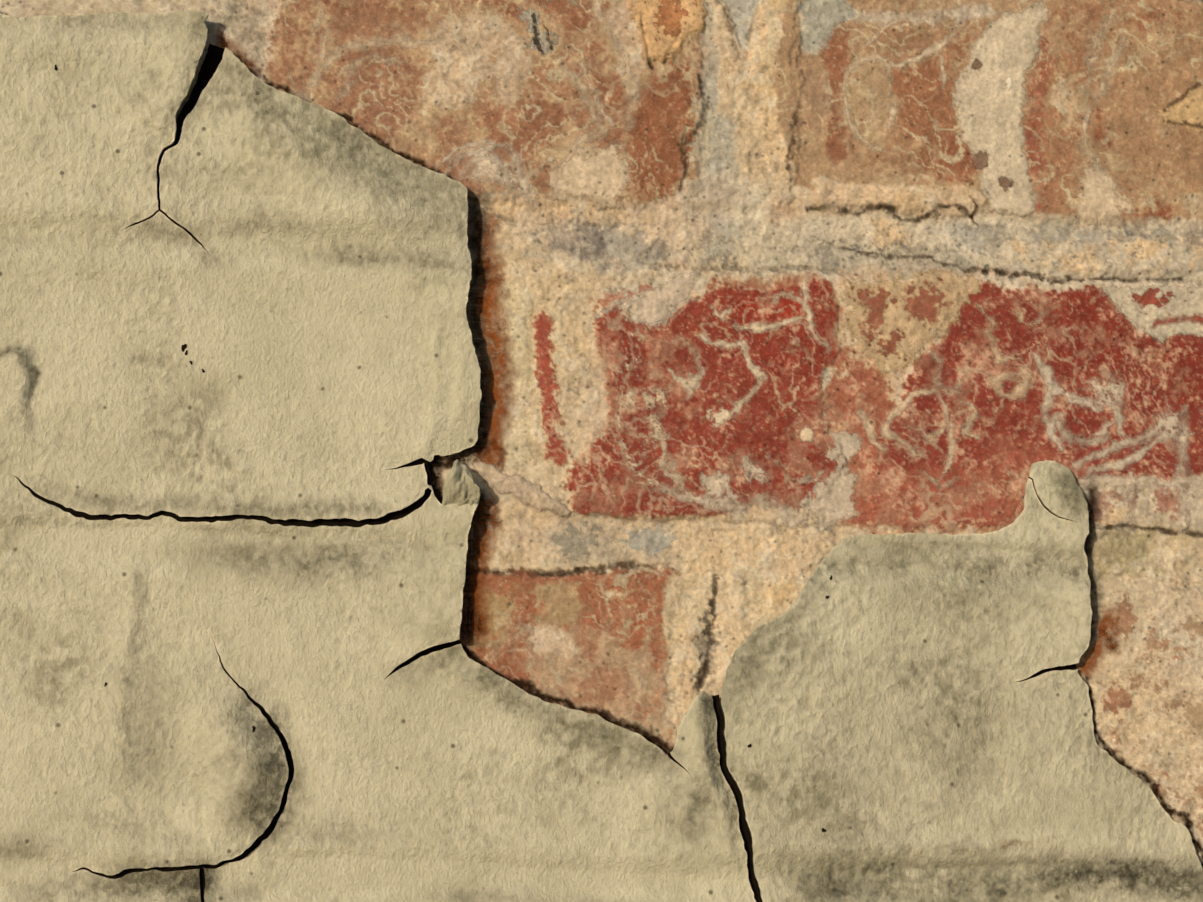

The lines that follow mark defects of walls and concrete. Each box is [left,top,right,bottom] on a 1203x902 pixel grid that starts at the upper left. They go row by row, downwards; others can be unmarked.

crack [125,44,225,254]
spalling [518,0,558,54]
spalling [626,0,708,62]
peeling [952,1,1048,217]
spalling [1158,83,1203,133]
spalling [838,269,981,372]
crack [12,458,432,527]
peeling [0,10,756,902]
crack [72,638,294,902]
crack [667,753,692,777]
crack [697,578,762,902]
peeling [720,460,1203,902]